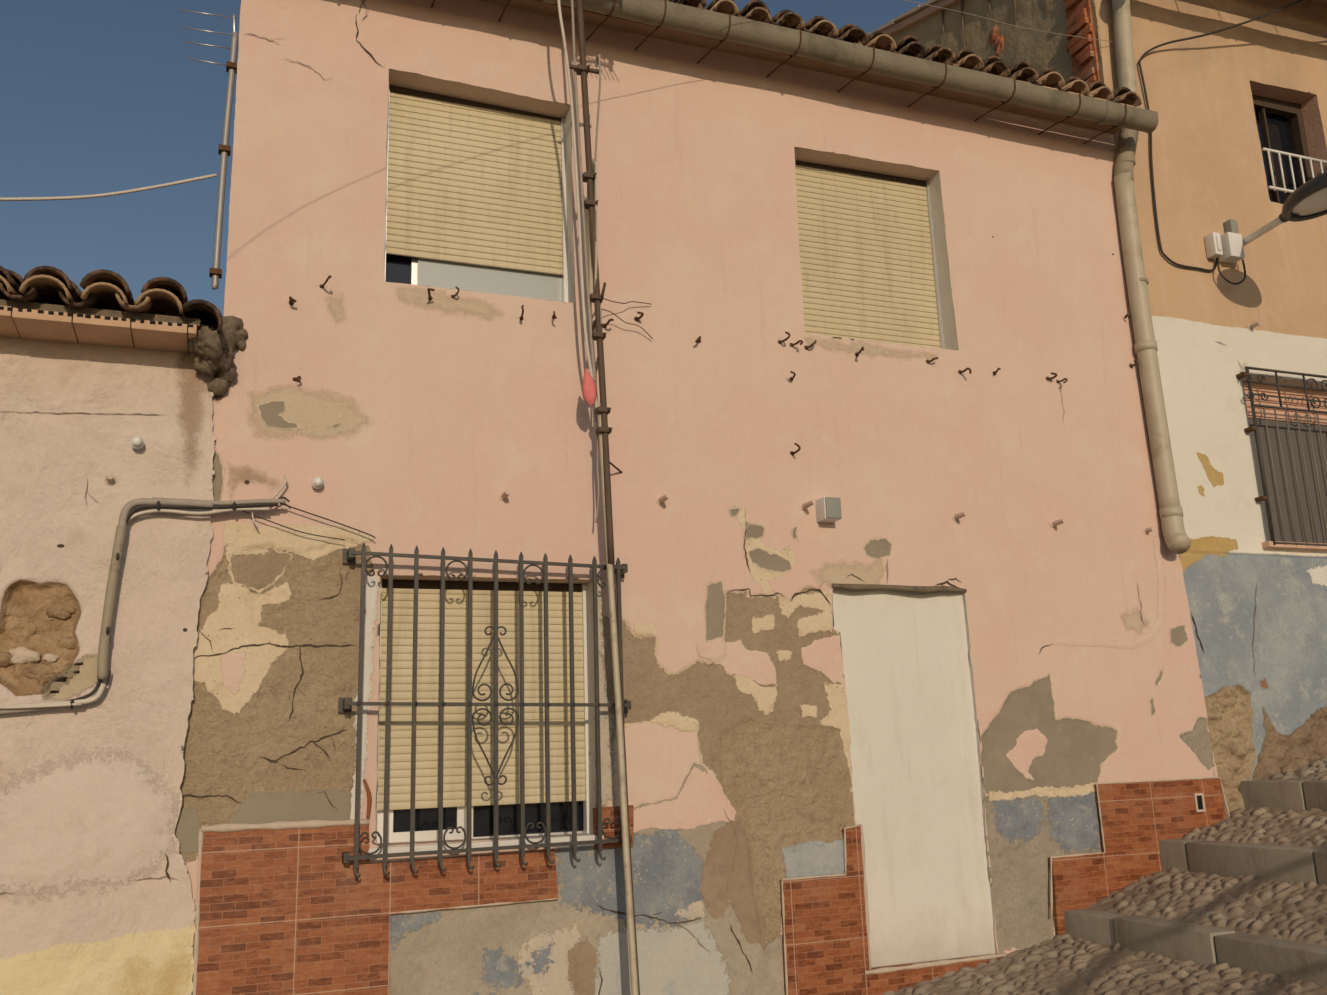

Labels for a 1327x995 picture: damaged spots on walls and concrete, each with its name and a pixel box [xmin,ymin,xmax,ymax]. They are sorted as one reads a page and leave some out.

crack [0,409,166,417]
flaking render [256,400,307,430]
peeling [1197,452,1224,497]
flaking render [0,579,98,700]
crack [182,787,242,804]
crack [194,628,351,812]
peeling [175,520,373,862]
peeling [389,506,967,995]
peeling [980,673,1119,953]
flaking render [1180,685,1327,814]